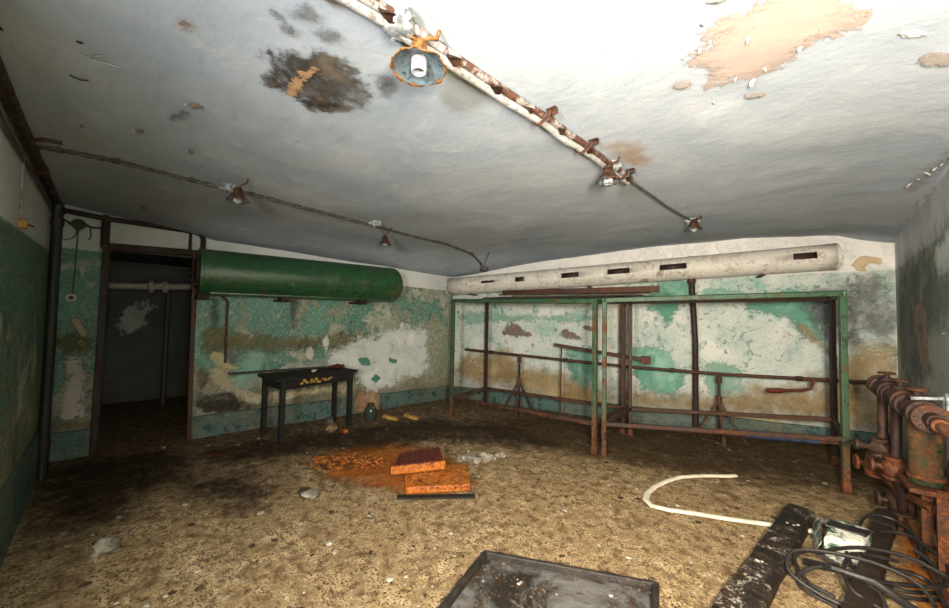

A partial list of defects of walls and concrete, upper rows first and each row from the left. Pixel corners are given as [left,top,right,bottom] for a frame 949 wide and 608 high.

leakage [261,3,393,113]
peeling [673,0,874,105]
peeling [842,256,882,271]
peeling [934,229,949,279]
spalling [502,323,536,338]